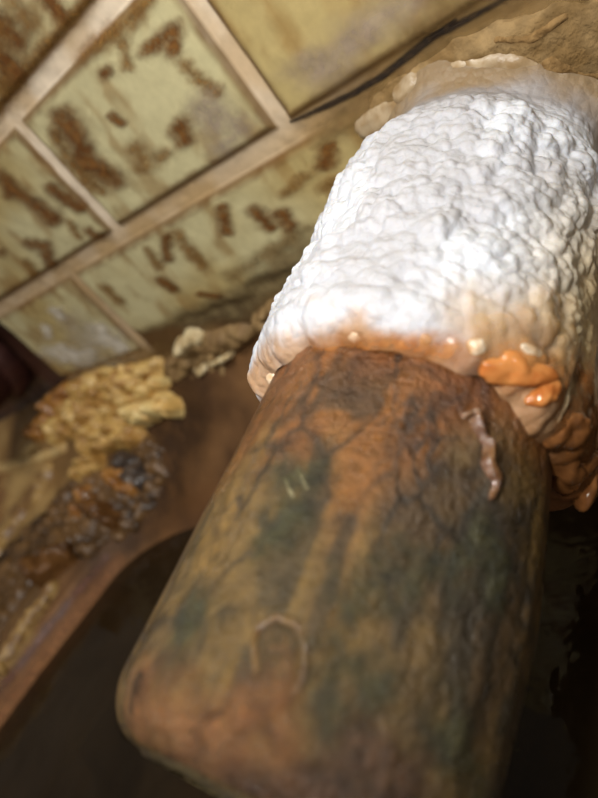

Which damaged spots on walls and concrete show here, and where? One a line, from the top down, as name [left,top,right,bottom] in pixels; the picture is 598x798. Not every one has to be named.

water stain [176,0,598,444]
water stain [0,298,274,677]
rust [315,337,459,360]
water stain [461,408,503,501]
rust [476,336,598,513]